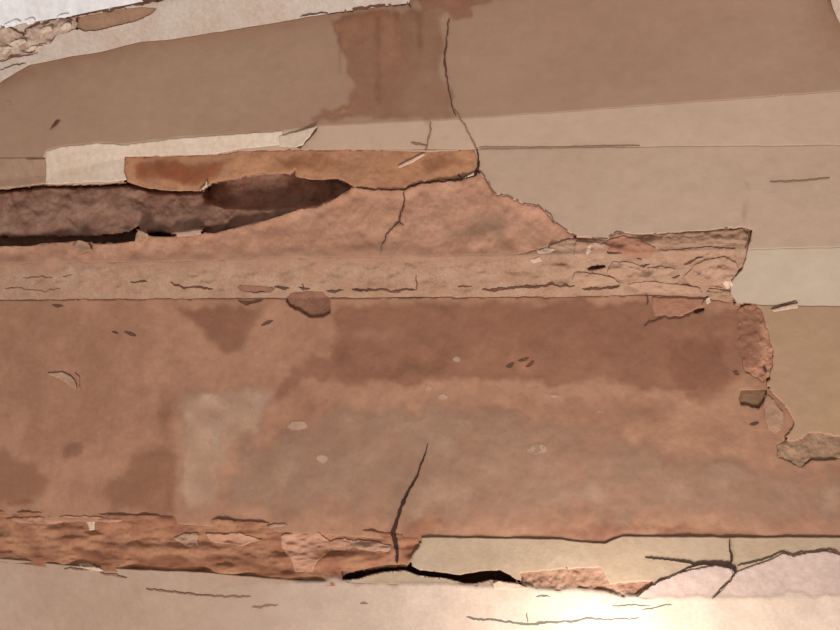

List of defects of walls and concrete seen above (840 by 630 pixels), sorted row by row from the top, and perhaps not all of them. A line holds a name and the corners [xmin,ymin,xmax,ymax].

spalling [0,8,155,60]
leakage [322,9,415,120]
crack [356,20,649,268]
peeling [0,126,840,586]
leakage [280,298,757,394]
crack [343,444,515,582]
crack [467,539,840,626]
peeling [493,551,840,598]